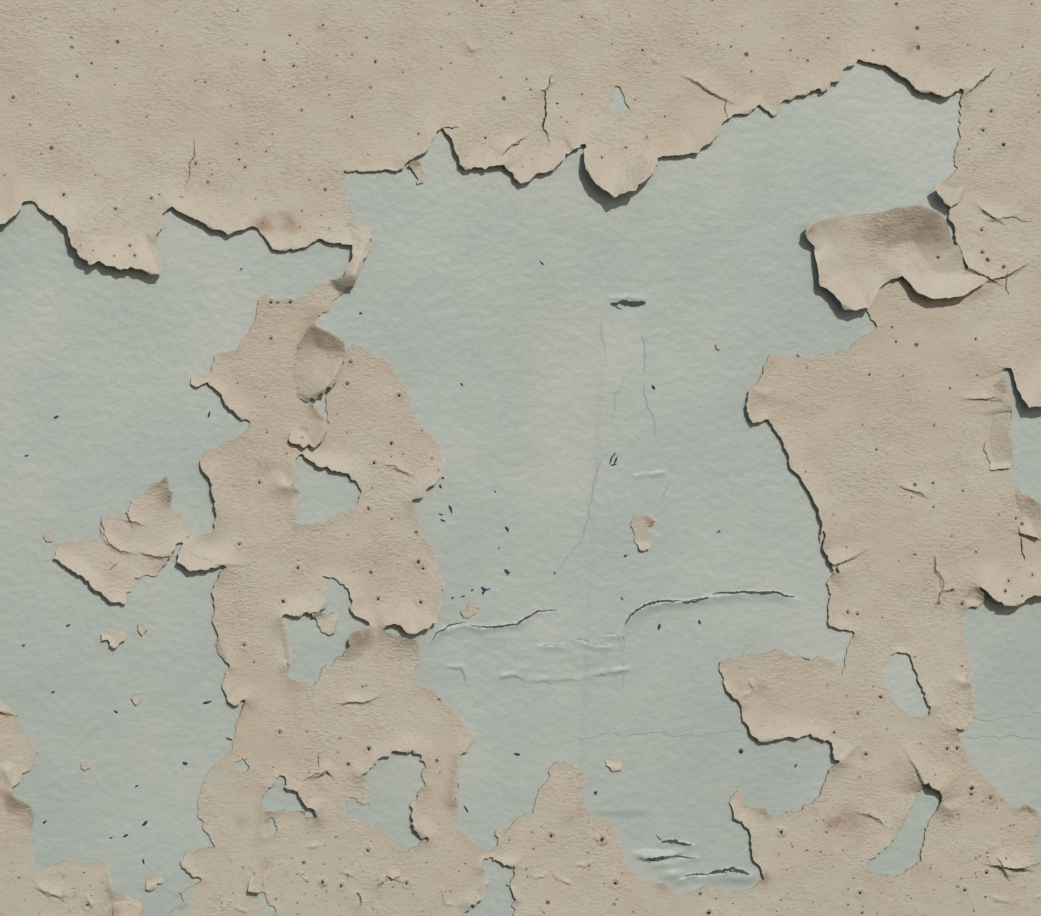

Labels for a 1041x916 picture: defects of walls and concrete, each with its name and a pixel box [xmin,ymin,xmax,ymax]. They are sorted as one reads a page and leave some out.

peeling [979,338,1041,538]
peeling [258,43,987,894]
peeling [0,178,355,916]
crack [432,610,557,640]
crack [624,590,794,626]
crack [502,669,627,690]
peeling [946,561,1041,857]
crack [646,835,750,877]
peeling [461,857,521,916]